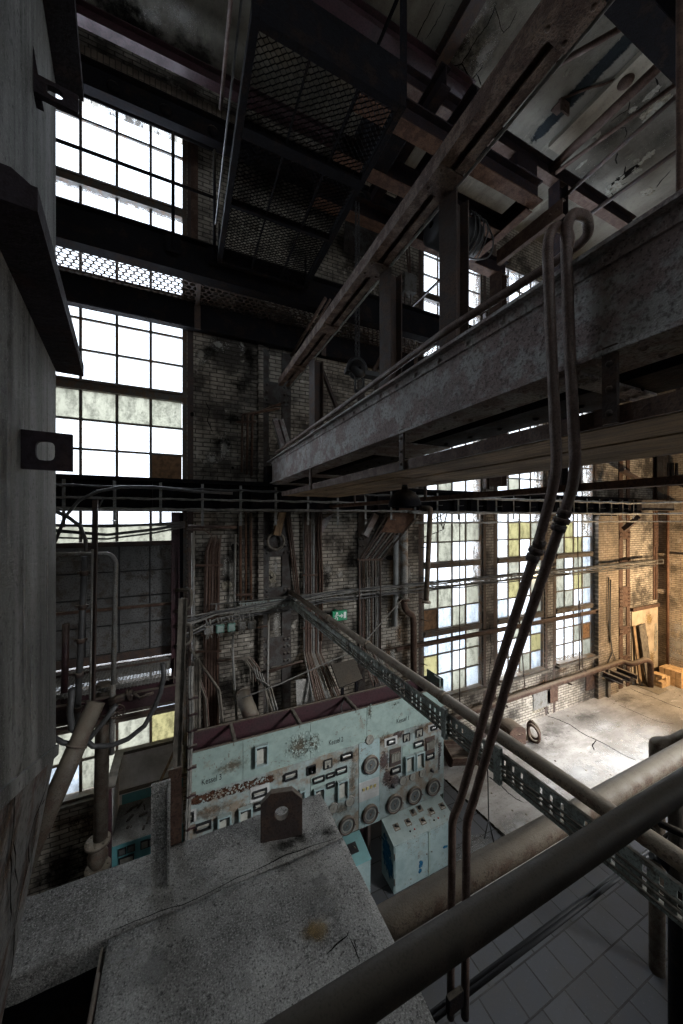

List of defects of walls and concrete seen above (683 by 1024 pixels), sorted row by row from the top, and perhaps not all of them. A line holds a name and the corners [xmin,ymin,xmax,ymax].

crack [455,3,517,86]
spalling [605,149,655,196]
crack [328,931,360,962]